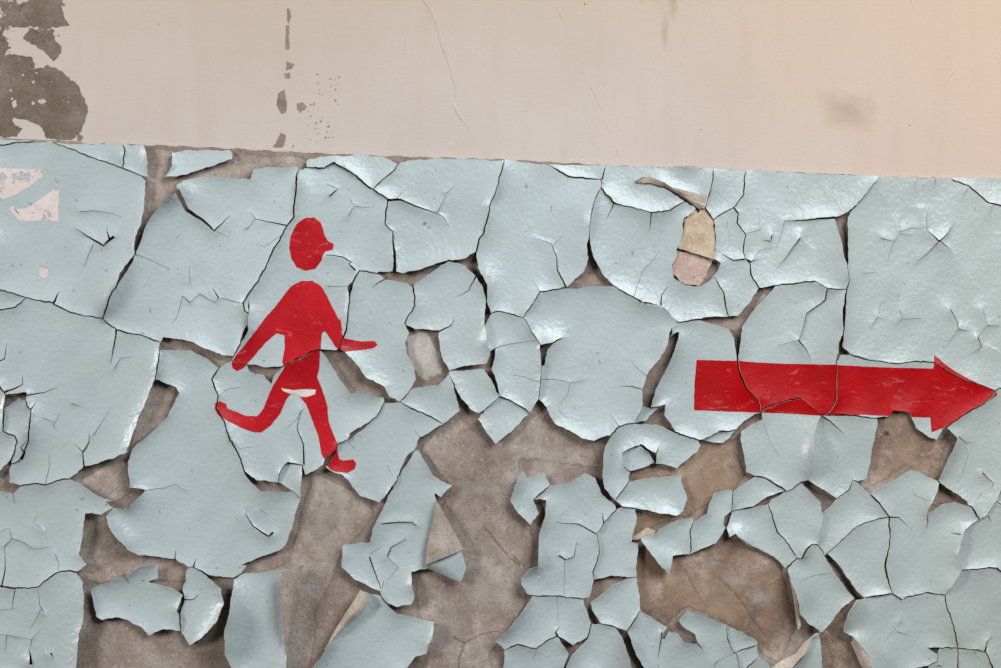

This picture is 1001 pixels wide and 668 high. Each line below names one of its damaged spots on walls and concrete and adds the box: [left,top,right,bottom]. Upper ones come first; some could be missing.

spalling [273,133,286,148]
spalling [277,73,332,142]
peeling [0,141,1001,668]